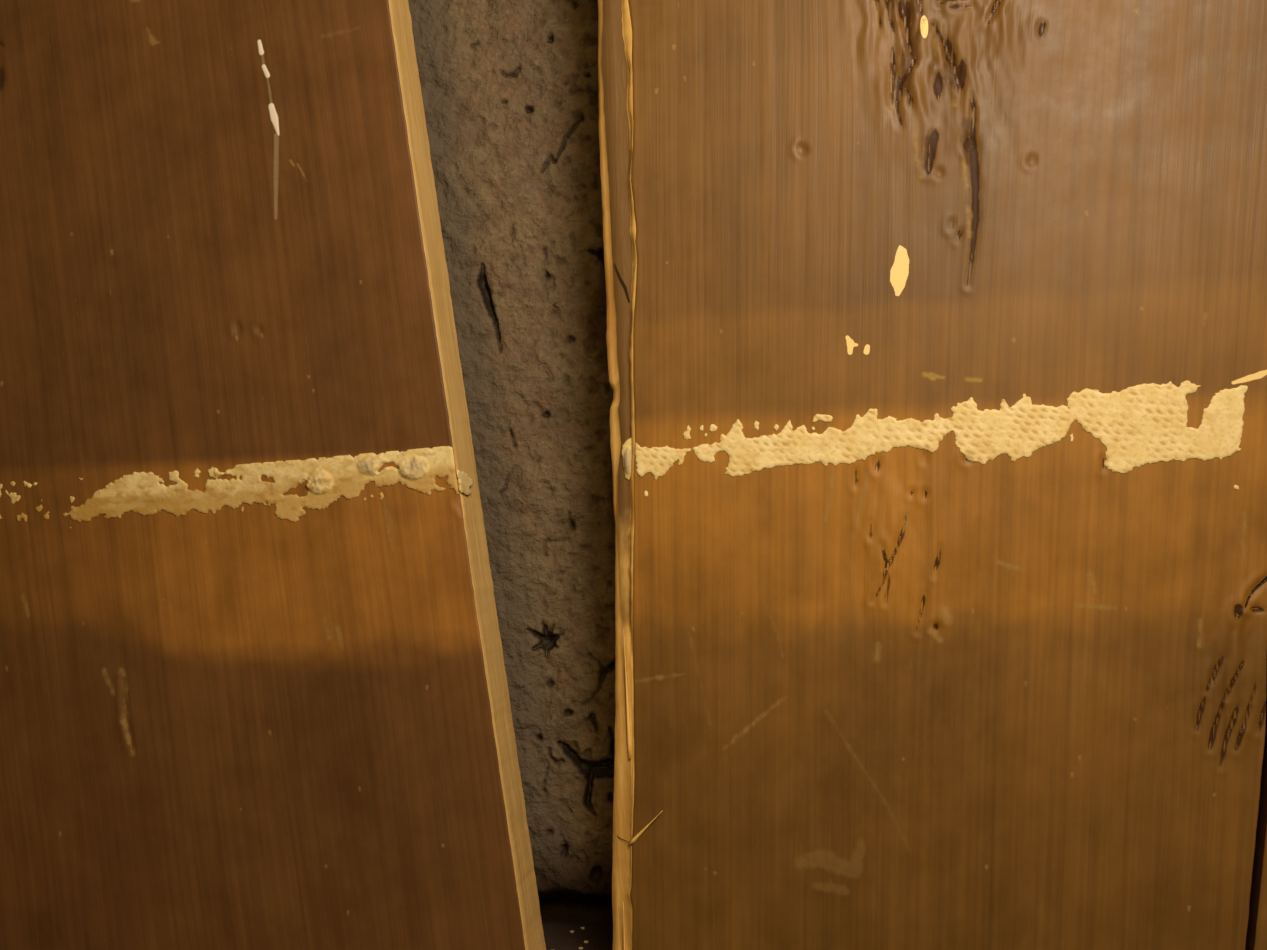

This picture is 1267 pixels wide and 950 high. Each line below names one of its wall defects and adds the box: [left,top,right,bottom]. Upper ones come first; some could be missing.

peeling [890,245,909,296]
peeling [621,370,1267,497]
peeling [0,446,474,529]